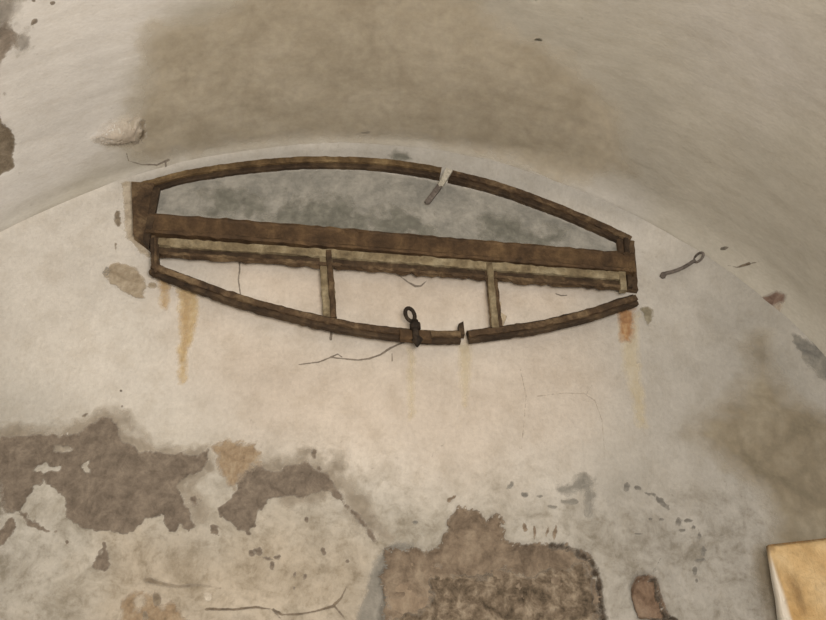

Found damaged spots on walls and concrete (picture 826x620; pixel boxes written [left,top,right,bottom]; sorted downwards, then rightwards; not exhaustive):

peeling [0,0,29,62]
water stain [131,0,625,182]
flaking render [0,118,15,175]
flaking render [103,263,157,298]
corrosion [178,289,198,383]
crack [299,332,405,365]
corrosion [618,310,643,421]
water stain [700,336,826,544]
flaking render [0,405,608,620]
crack [144,577,202,588]
crack [205,589,346,618]
water stain [758,552,773,589]